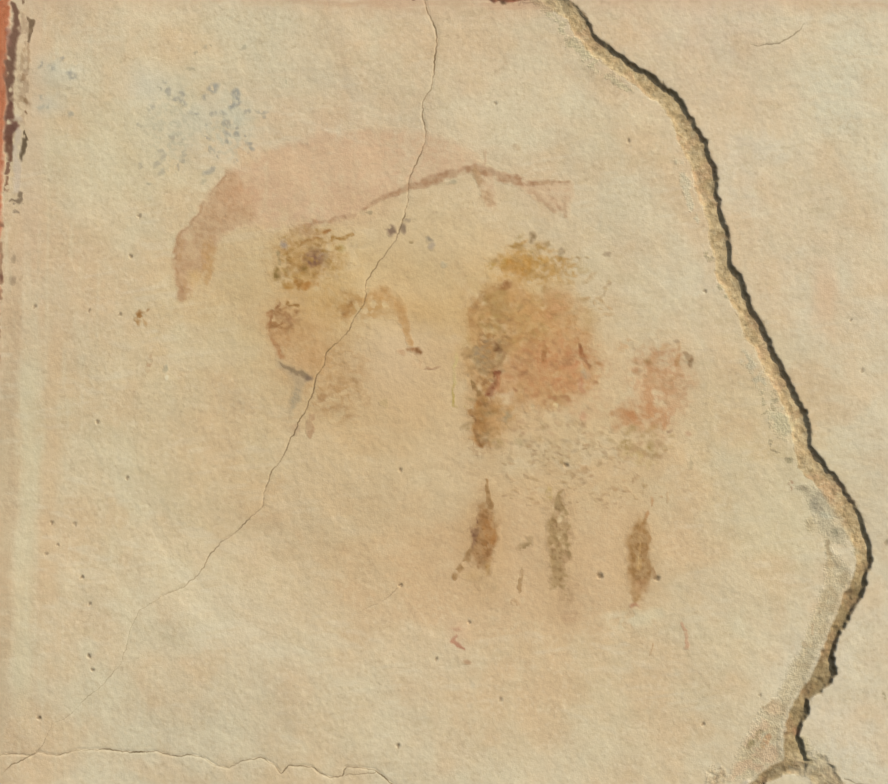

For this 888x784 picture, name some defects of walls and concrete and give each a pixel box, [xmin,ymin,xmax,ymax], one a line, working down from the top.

peeling [0,241,24,341]
peeling [2,0,36,213]
crack [0,0,438,784]
crack [506,0,874,784]